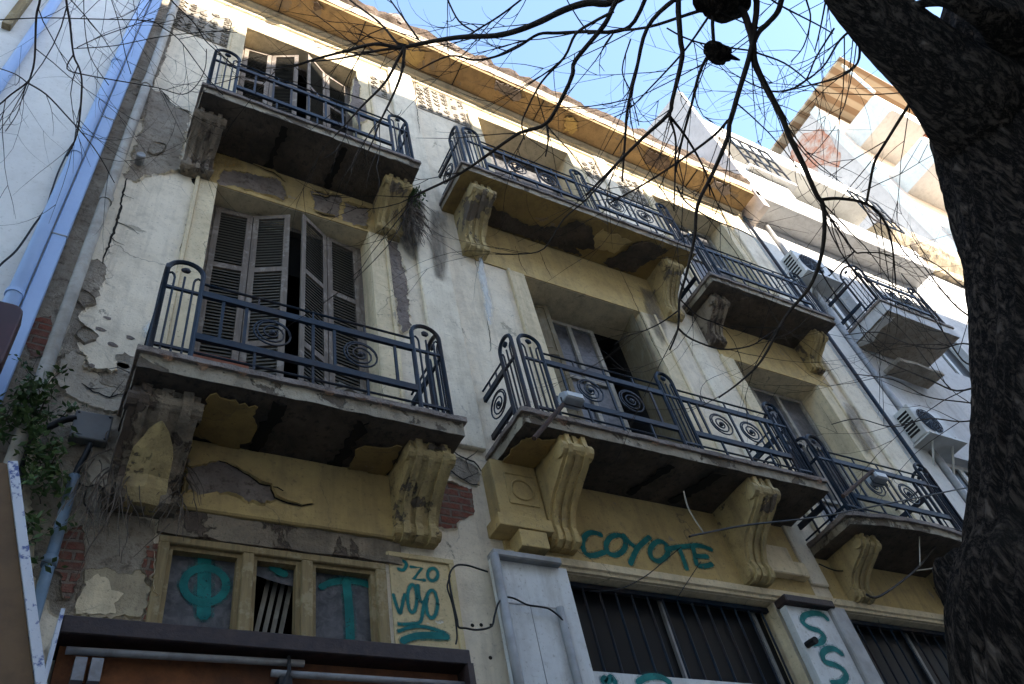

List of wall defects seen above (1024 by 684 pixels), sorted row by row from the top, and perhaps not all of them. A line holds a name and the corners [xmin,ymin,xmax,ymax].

peeling [121,26,196,188]
spalling [215,125,288,202]
crack [102,178,139,263]
spalling [488,206,668,273]
peeling [25,259,161,622]
peeling [193,393,287,452]
spalling [184,460,277,506]
flaking render [438,455,482,532]